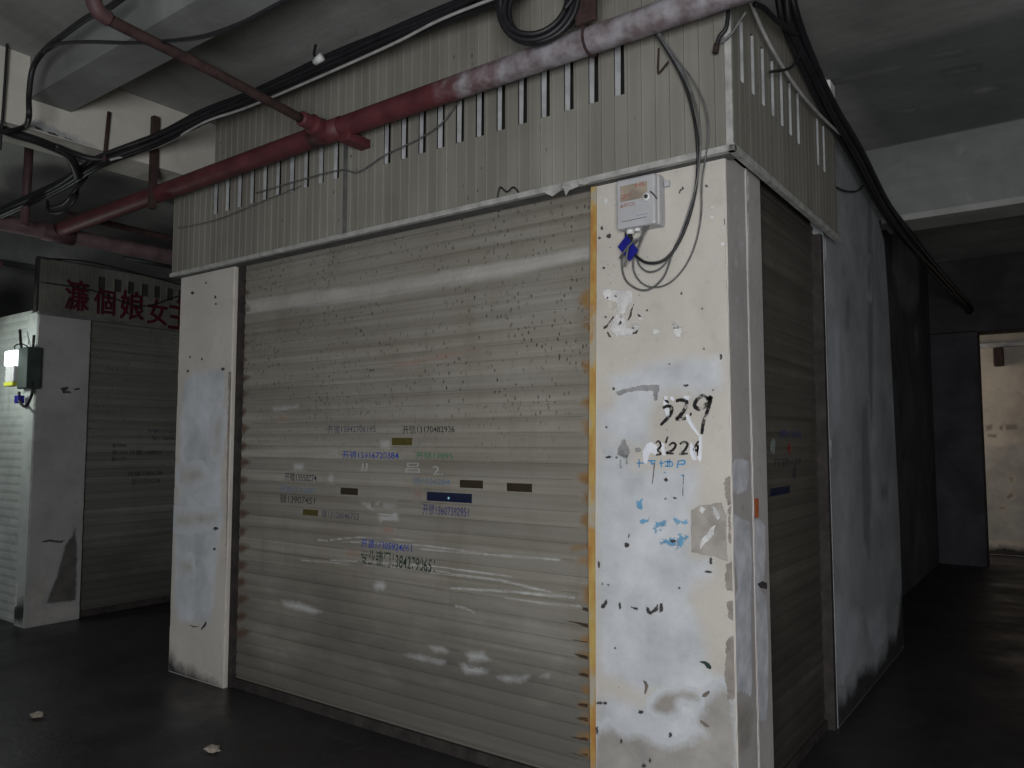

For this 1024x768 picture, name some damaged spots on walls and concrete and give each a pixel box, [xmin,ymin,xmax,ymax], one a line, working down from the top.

spalling [602,267,648,338]
damp [616,385,659,400]
damp [617,440,641,469]
damp [596,677,756,768]